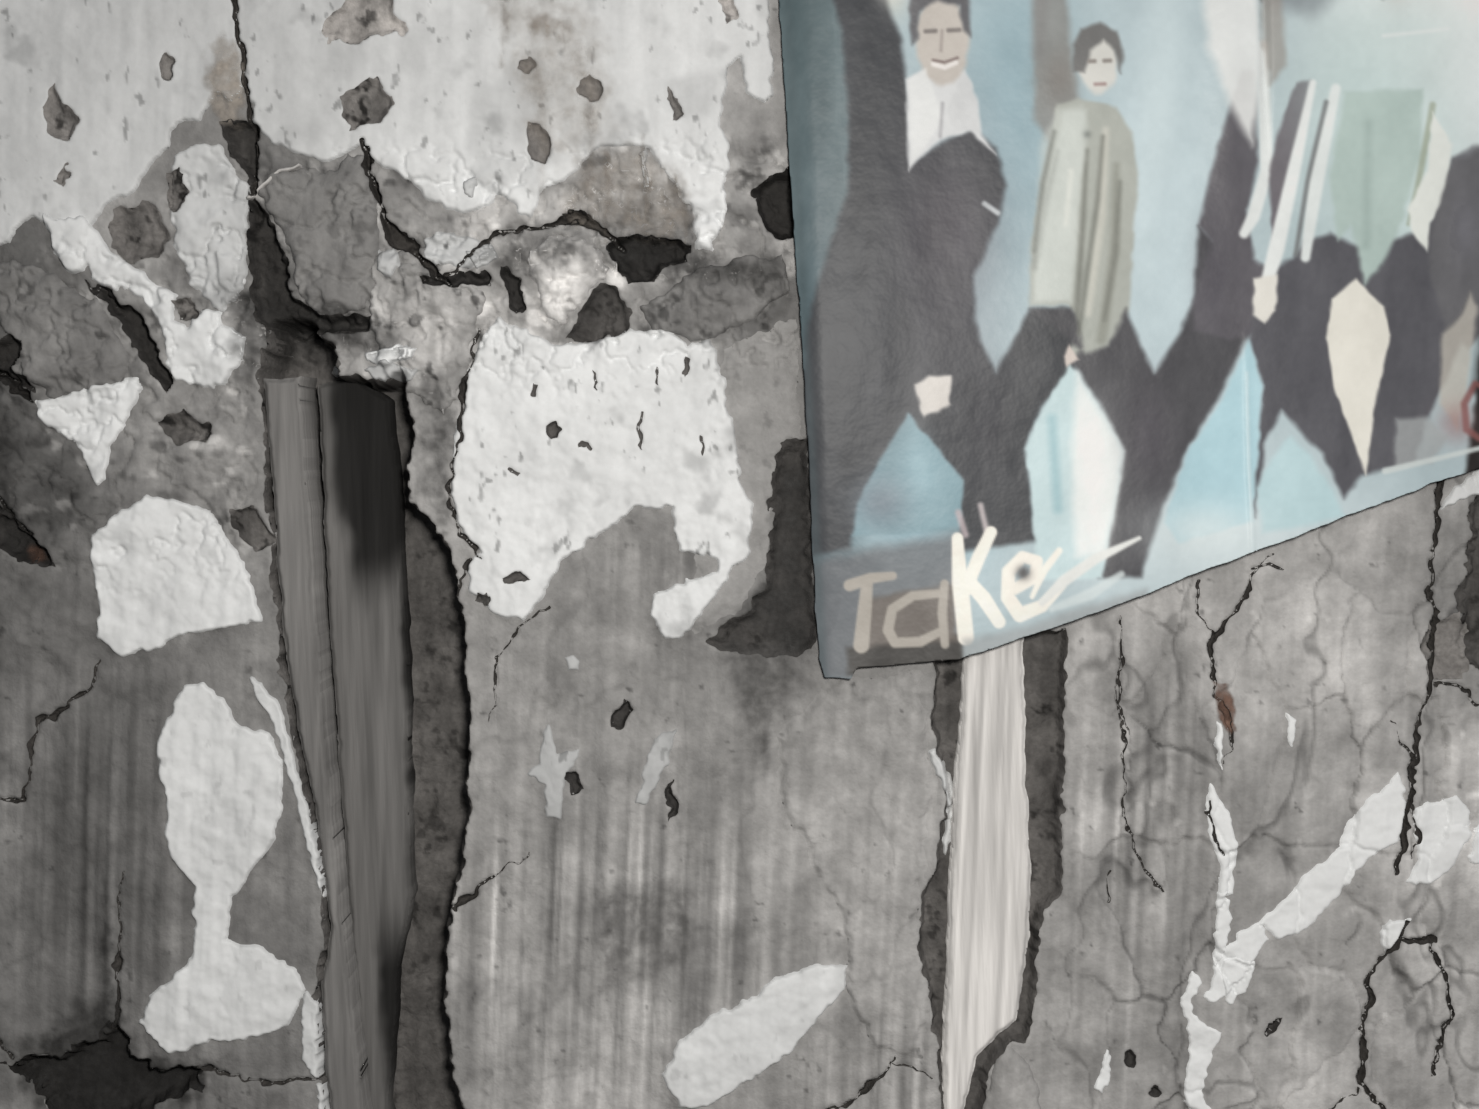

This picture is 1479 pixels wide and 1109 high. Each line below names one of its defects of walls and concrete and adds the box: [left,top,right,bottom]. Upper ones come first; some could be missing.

crack [231,0,259,196]
crack [359,138,627,287]
peeling [0,0,817,1109]
crack [1106,617,1164,903]
crack [1196,553,1284,764]
peeling [1285,713,1296,747]
crack [1390,479,1479,875]
peeling [1180,722,1479,1109]
peeling [662,964,848,1109]
peeling [1094,1050,1136,1093]
spalling [1149,1085,1162,1097]
crack [1331,920,1455,1109]